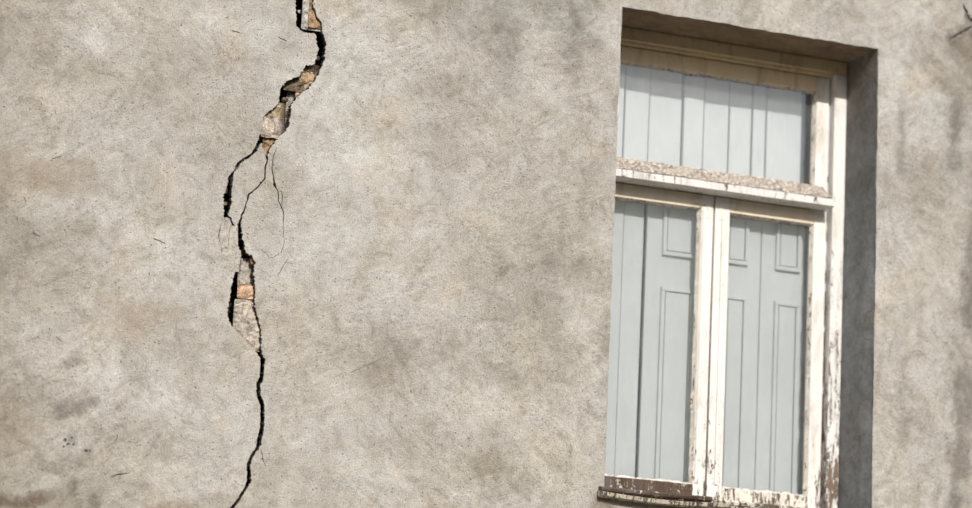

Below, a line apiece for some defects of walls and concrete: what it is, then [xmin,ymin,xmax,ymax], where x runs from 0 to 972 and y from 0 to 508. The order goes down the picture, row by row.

crack [218,0,327,508]